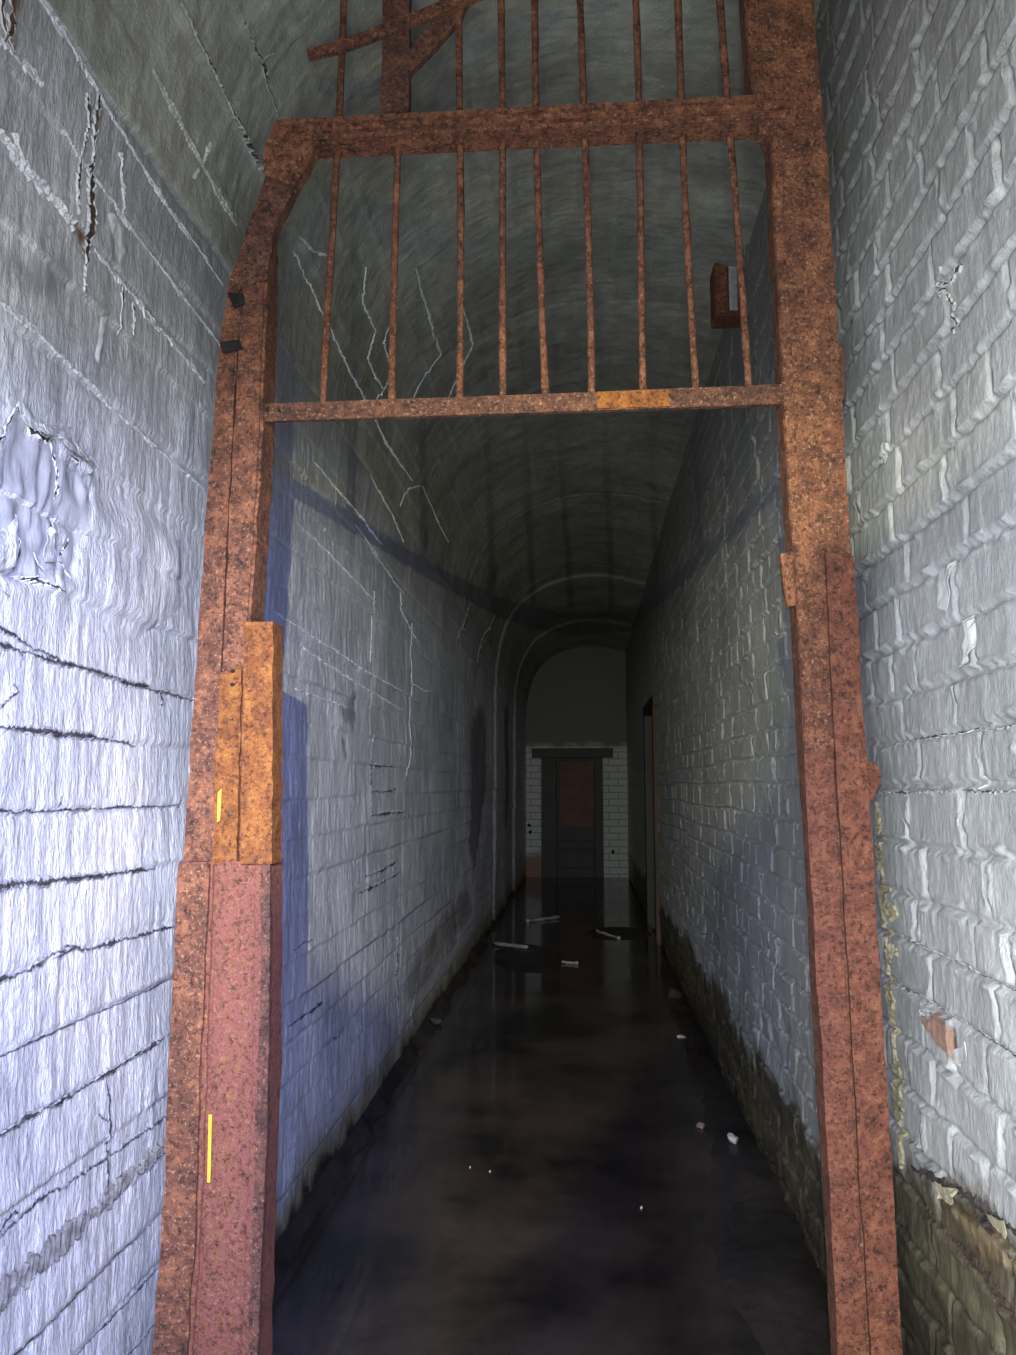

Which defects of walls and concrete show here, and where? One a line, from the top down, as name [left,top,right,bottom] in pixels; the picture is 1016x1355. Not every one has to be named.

crack [0,0,18,52]
crack [75,92,102,292]
crack [117,287,136,336]
rust [597,389,669,409]
crack [0,625,194,747]
crack [0,865,155,893]
crack [0,925,175,985]
rust [248,864,272,1355]